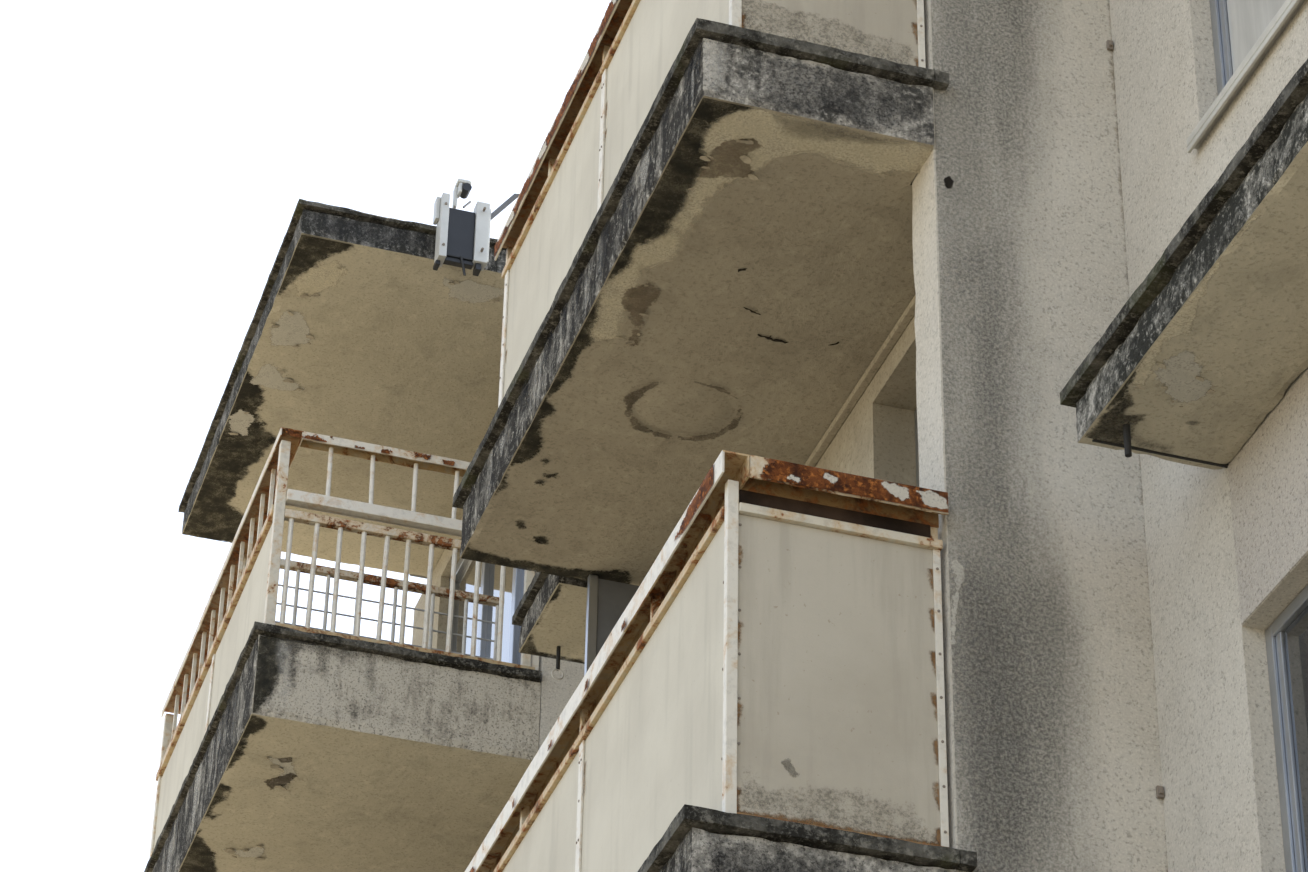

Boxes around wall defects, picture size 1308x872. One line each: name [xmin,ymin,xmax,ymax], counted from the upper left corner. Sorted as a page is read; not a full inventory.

rust [494,0,617,258]
leakage [278,213,432,294]
leakage [494,39,754,495]
leakage [183,371,276,543]
rust [285,428,334,442]
rust [412,452,455,466]
rust [675,463,714,539]
rust [760,460,949,513]
leakage [1085,361,1146,445]
leakage [461,547,630,664]
leakage [166,635,357,872]
rust [737,788,941,846]